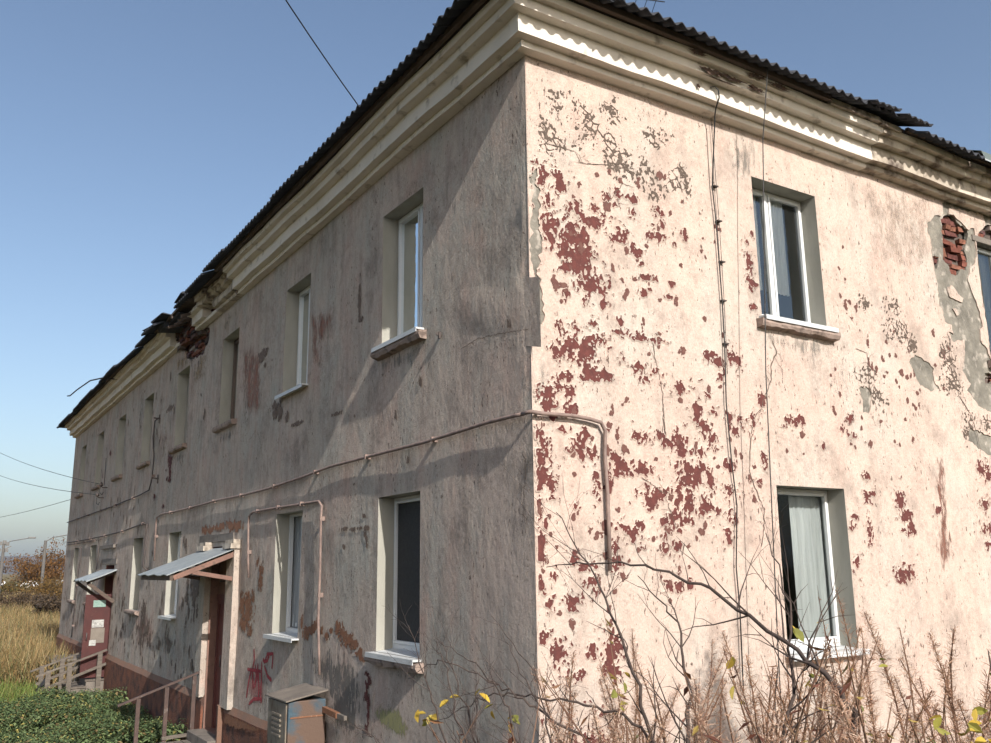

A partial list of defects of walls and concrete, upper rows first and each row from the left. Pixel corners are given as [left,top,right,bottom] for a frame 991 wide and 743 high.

spalling [175,320,210,367]
spalling [867,201,991,412]
peeling [202,519,244,535]
peeling [528,148,769,743]
peeling [780,407,806,438]
peeling [832,386,873,449]
peeling [848,469,881,582]
peeling [885,474,918,591]
spalling [968,429,991,562]
peeling [238,558,264,636]
peeling [301,614,371,734]